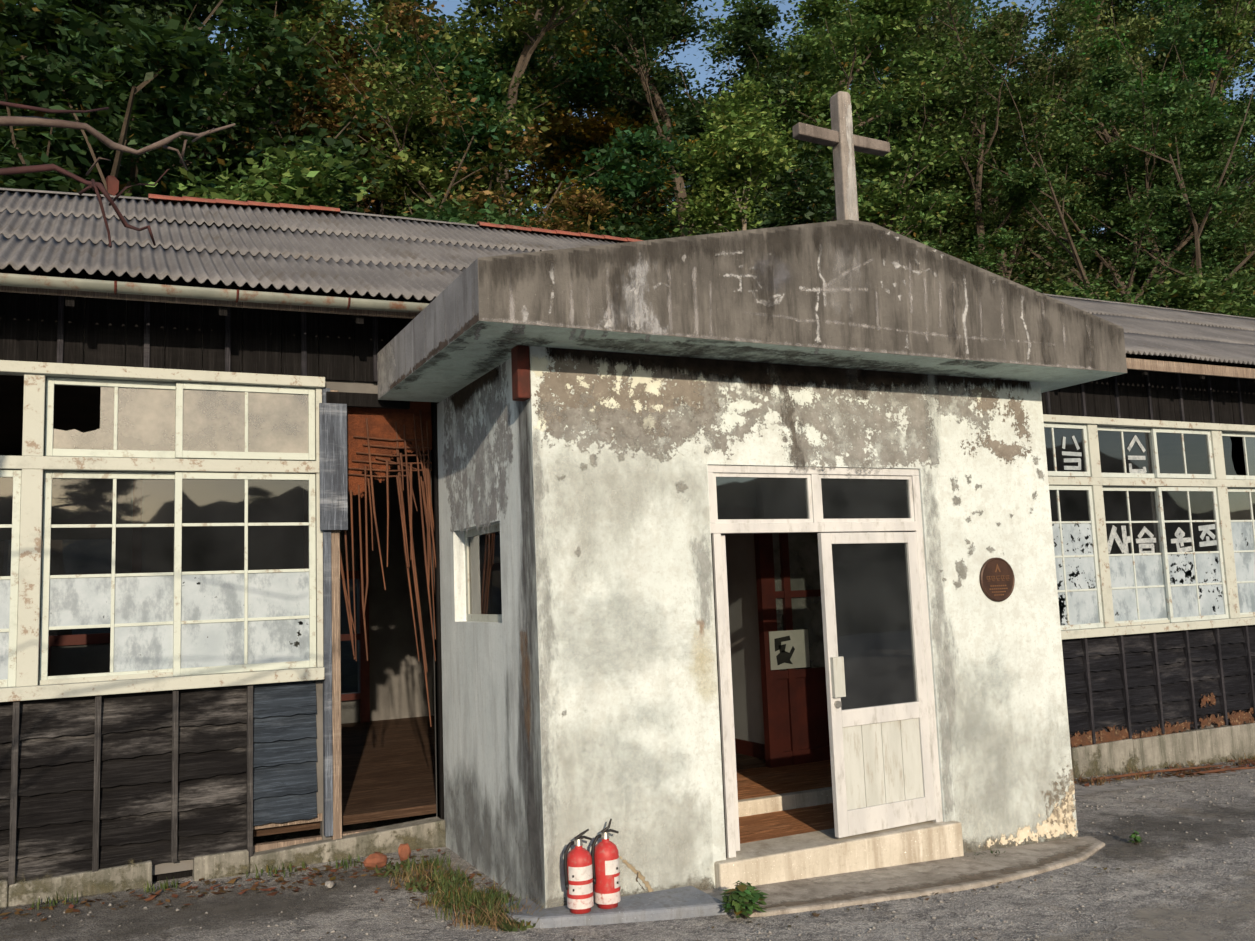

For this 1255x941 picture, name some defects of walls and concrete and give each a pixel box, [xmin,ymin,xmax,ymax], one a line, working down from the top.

damp [993,280,1121,370]
peeling [530,348,1044,513]
peeling [951,475,983,522]
damp [442,223,1031,907]
peeling [939,538,1004,588]
peeling [978,765,1078,848]
damp [761,844,1090,909]